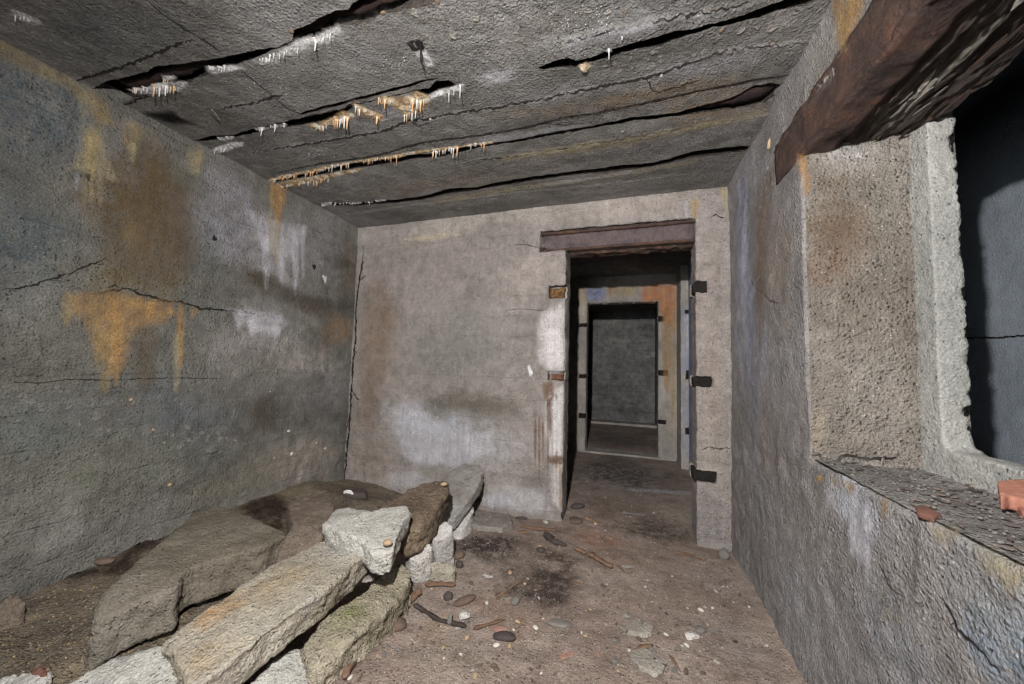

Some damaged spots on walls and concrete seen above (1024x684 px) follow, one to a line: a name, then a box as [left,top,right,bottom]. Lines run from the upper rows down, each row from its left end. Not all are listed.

crack [76,0,815,206]
crack [2,259,104,290]
crack [93,284,260,316]
crack [344,248,366,479]
rust [535,383,562,470]